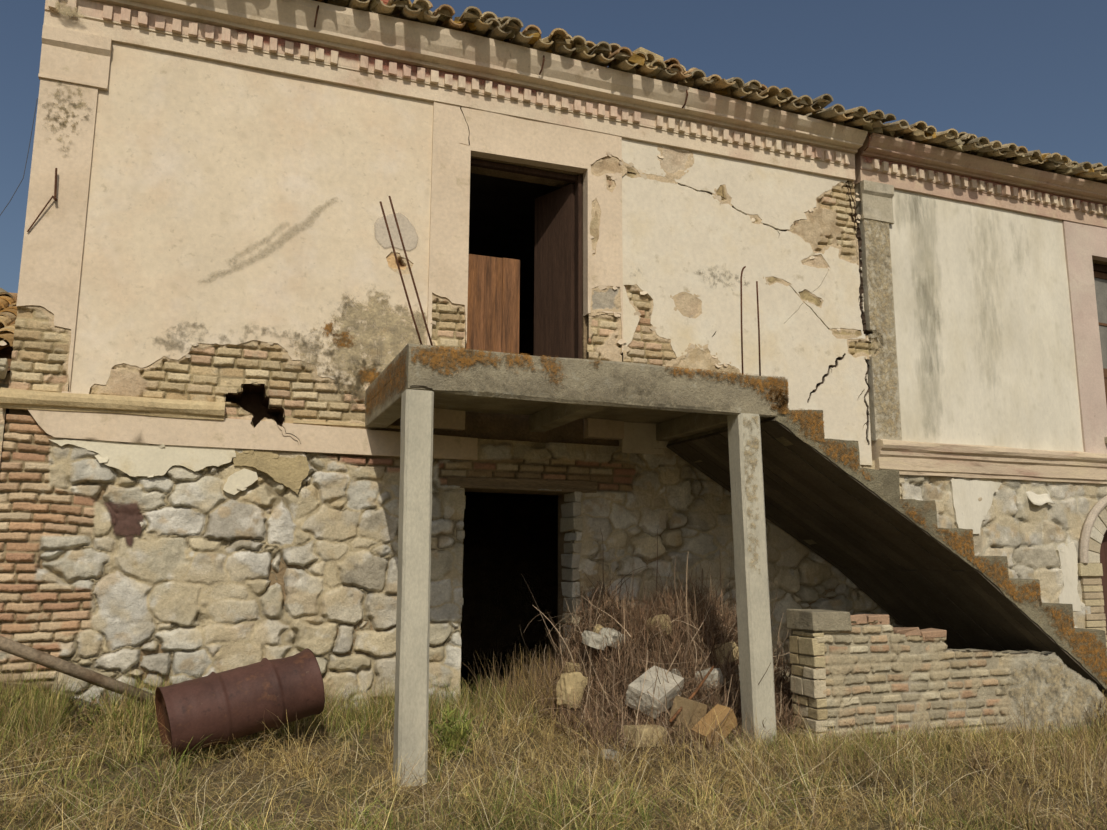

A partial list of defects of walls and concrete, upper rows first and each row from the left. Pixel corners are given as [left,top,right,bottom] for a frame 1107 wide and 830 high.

flaking render [380,196,465,348]
flaking render [591,146,694,193]
flaking render [587,266,746,374]
crack [679,184,791,231]
flaking render [756,276,823,376]
flaking render [787,182,861,271]
crack [807,180,876,445]
flaking render [89,340,376,430]